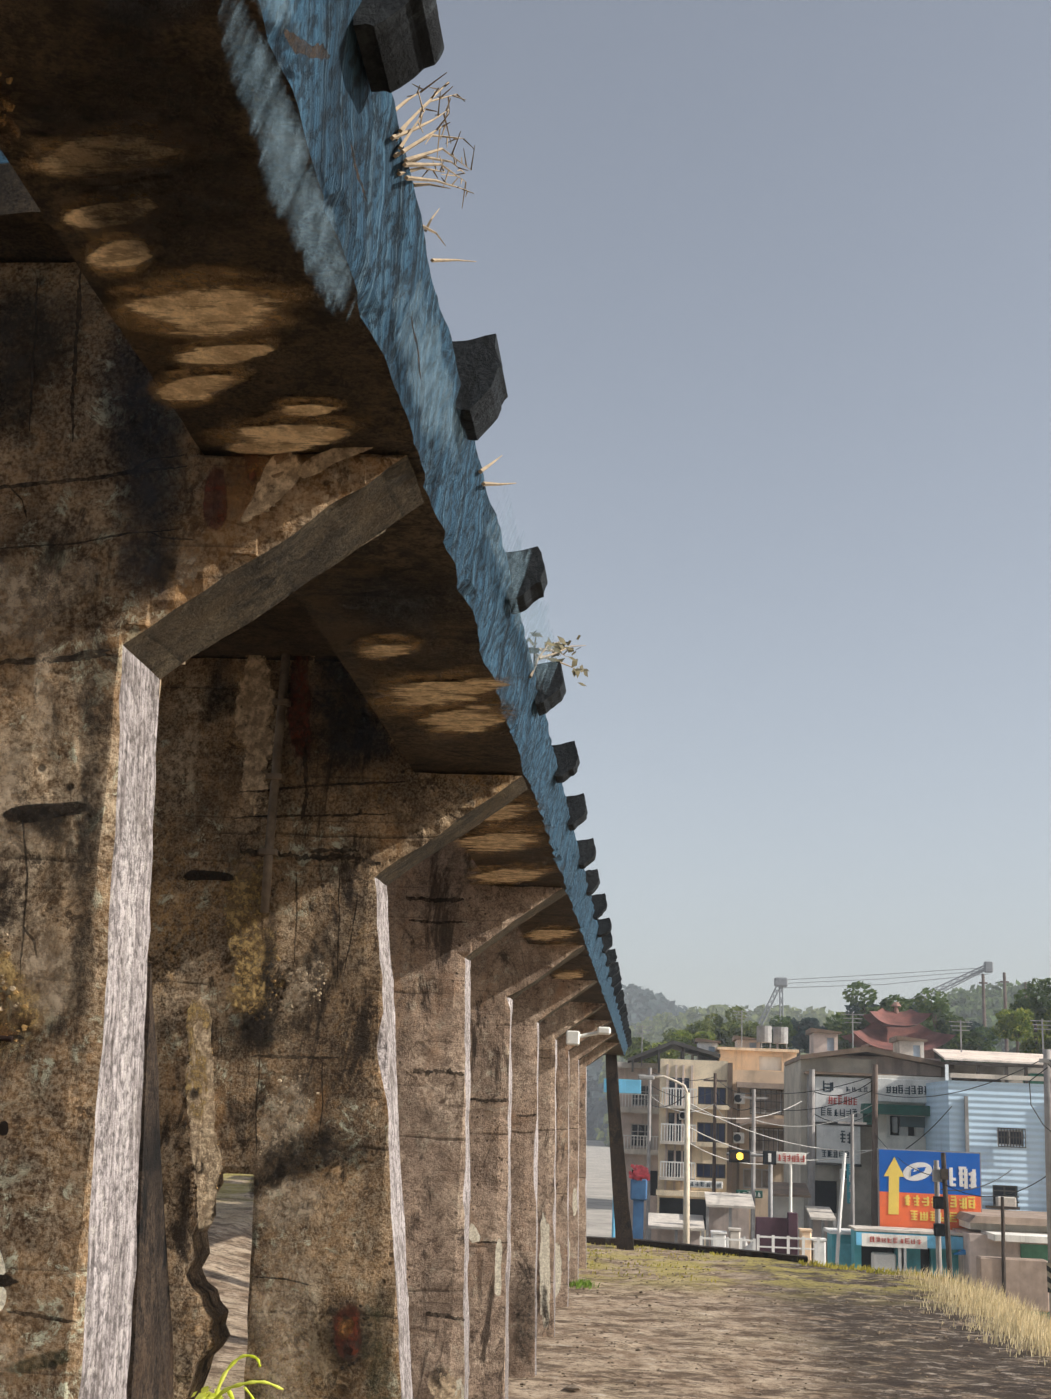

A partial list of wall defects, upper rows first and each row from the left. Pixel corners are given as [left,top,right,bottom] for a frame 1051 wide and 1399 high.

crack [0,471,197,549]
spalling [212,397,373,522]
water stain [315,656,389,765]
peeling [185,997,243,1229]